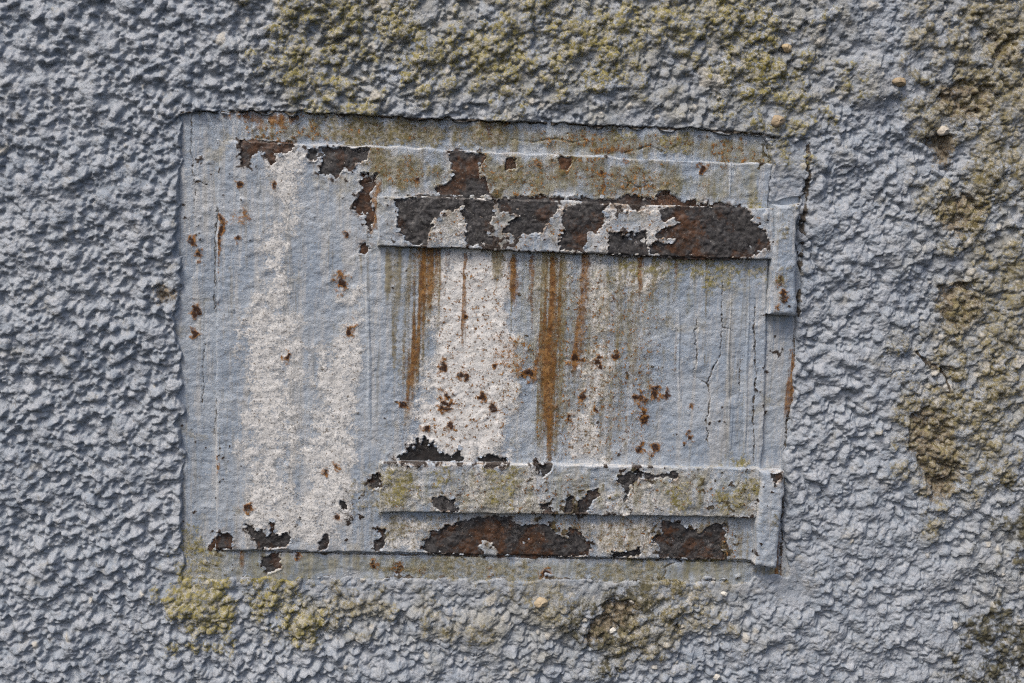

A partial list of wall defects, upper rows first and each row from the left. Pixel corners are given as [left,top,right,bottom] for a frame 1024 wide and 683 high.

peeling [208,139,770,572]
corrosion [385,210,693,530]
corrosion [548,472,754,553]